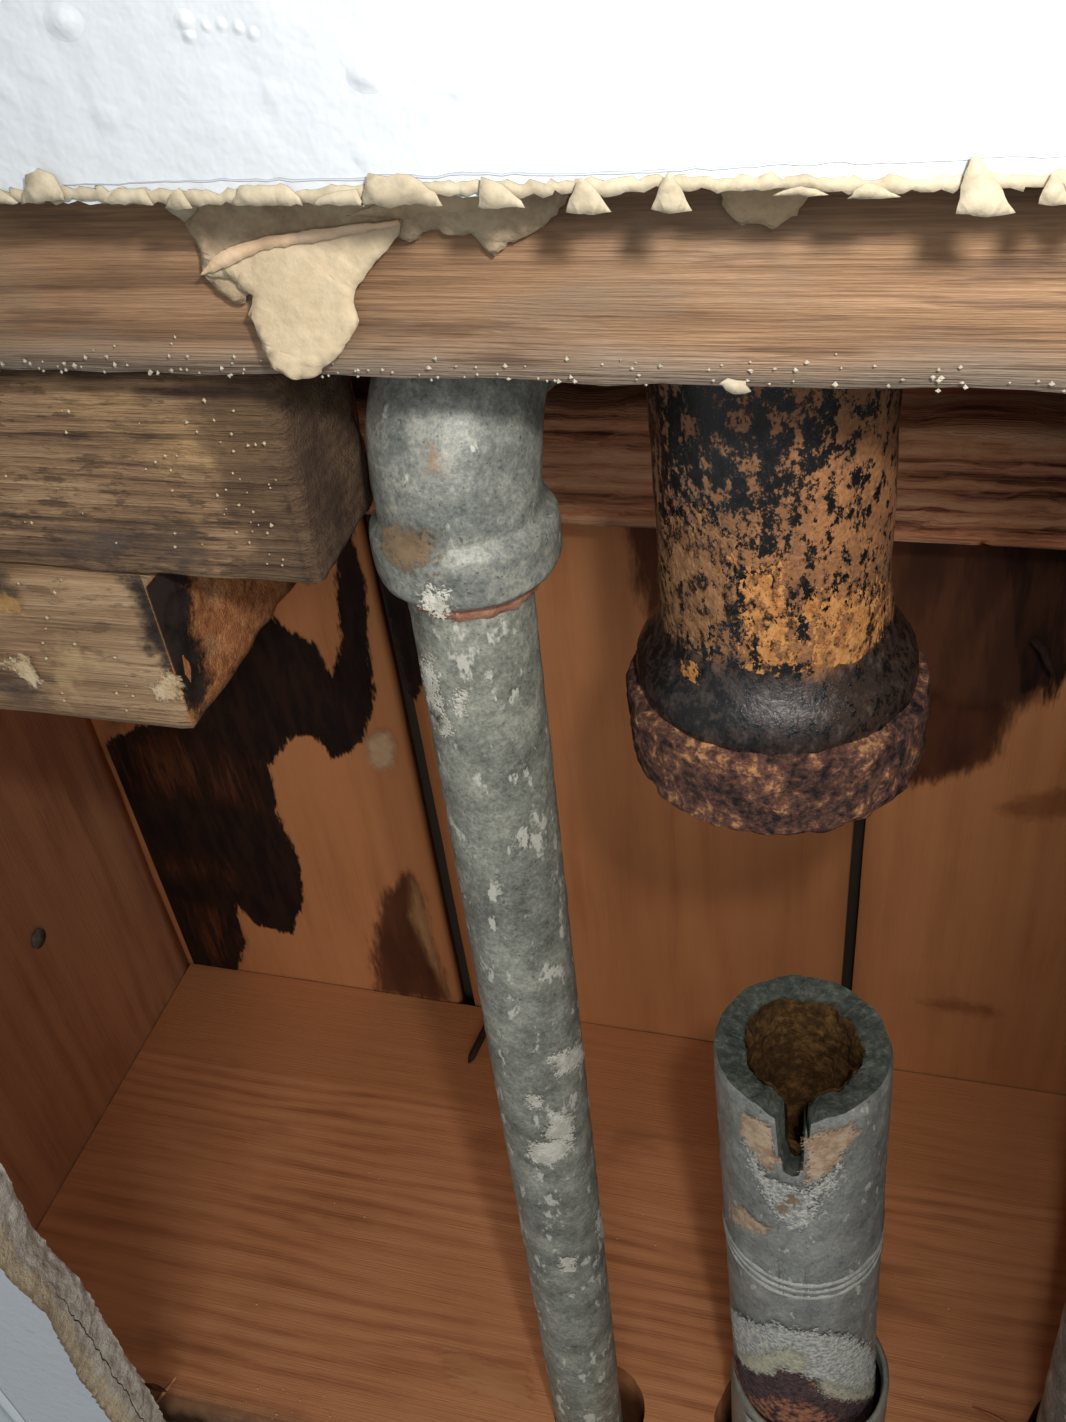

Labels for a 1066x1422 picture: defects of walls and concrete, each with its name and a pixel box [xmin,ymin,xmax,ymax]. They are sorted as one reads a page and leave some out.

water stain [368,515,443,576]
water stain [626,527,660,614]
peeling [0,654,44,688]
peeling [149,669,184,701]
peeling [418,652,474,741]
water stain [891,541,1066,784]
water stain [55,526,422,970]
water stain [373,875,447,1001]
peeling [546,1039,585,1080]
peeling [523,1093,576,1170]
peeling [735,1110,863,1185]
spalling [0,1163,166,1422]